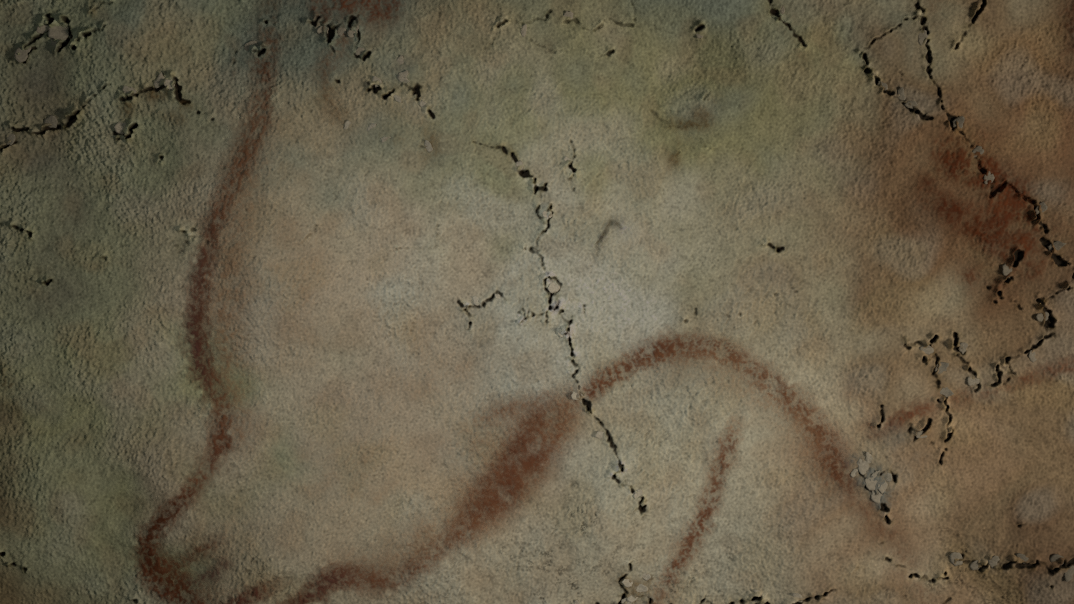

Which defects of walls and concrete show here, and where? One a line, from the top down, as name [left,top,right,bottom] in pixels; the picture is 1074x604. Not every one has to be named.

crack [311,15,435,119]
crack [0,106,84,151]
crack [103,72,214,140]
crack [863,0,1072,465]
crack [457,291,502,326]
crack [479,143,646,513]
crack [857,458,896,524]
crack [574,564,652,604]
crack [701,590,832,604]
crack [885,552,1074,602]